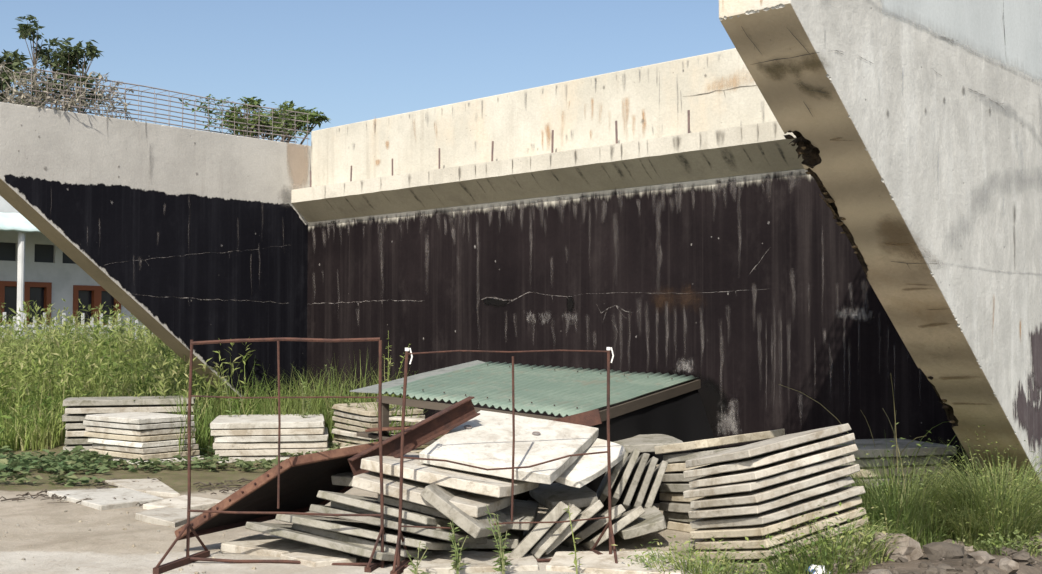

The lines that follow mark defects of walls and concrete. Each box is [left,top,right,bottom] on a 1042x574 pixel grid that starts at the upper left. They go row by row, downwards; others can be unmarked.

spalling [783,131,864,258]
crack [481,292,652,332]
damp [637,363,737,434]